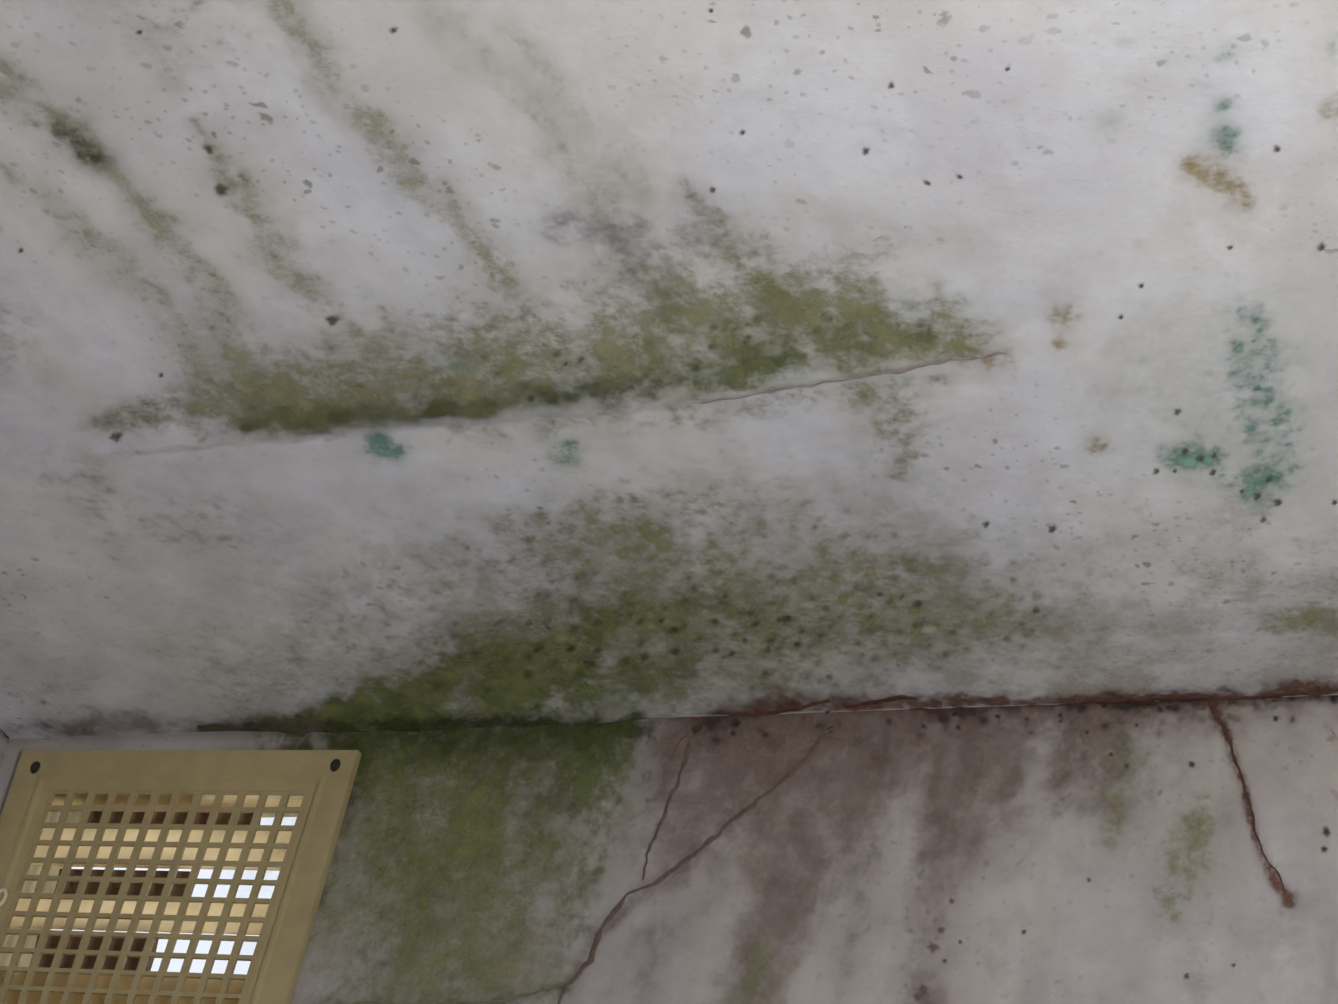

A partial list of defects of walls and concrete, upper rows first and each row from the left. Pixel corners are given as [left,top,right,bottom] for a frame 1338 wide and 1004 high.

water stain [206,146,250,195]
water stain [132,196,170,239]
water stain [367,433,404,458]
water stain [1256,618,1338,694]
water stain [1010,604,1155,790]
water stain [651,622,1023,933]
crack [435,721,842,1004]